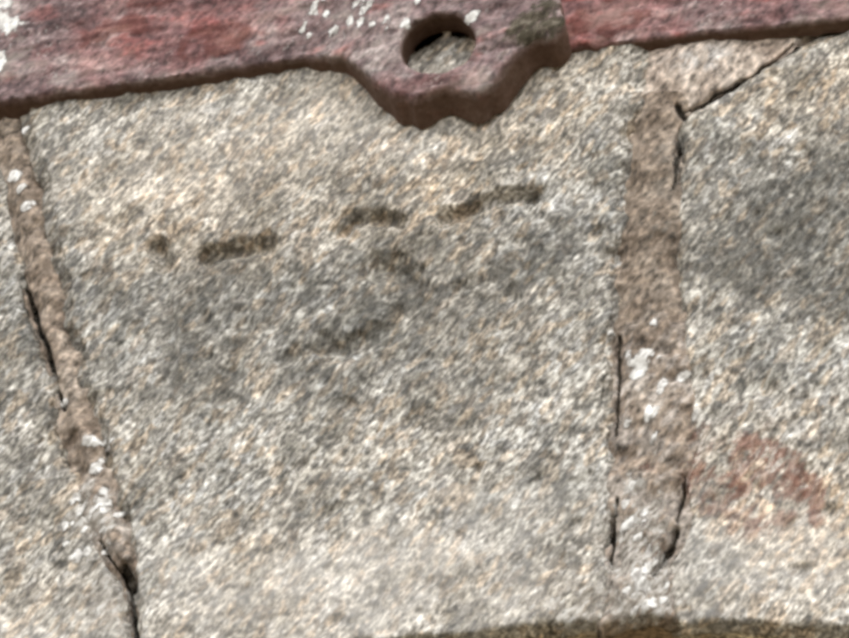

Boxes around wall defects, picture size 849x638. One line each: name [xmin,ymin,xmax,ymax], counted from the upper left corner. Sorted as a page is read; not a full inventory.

crack [675,45,794,122]
crack [672,142,683,190]
crack [24,291,57,374]
crack [614,336,622,437]
crack [609,499,619,569]
crack [652,476,687,578]
crack [100,541,140,638]